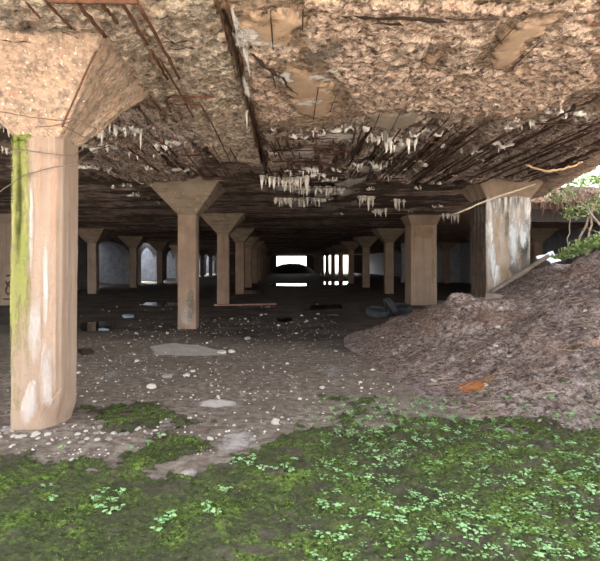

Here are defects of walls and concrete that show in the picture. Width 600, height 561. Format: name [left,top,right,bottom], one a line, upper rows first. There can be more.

water stain [81,123,143,160]
water stain [150,139,187,158]
rust [215,0,269,177]
spalling [0,0,600,187]
water stain [259,124,449,217]
water stain [0,125,40,343]
water stain [470,196,531,298]